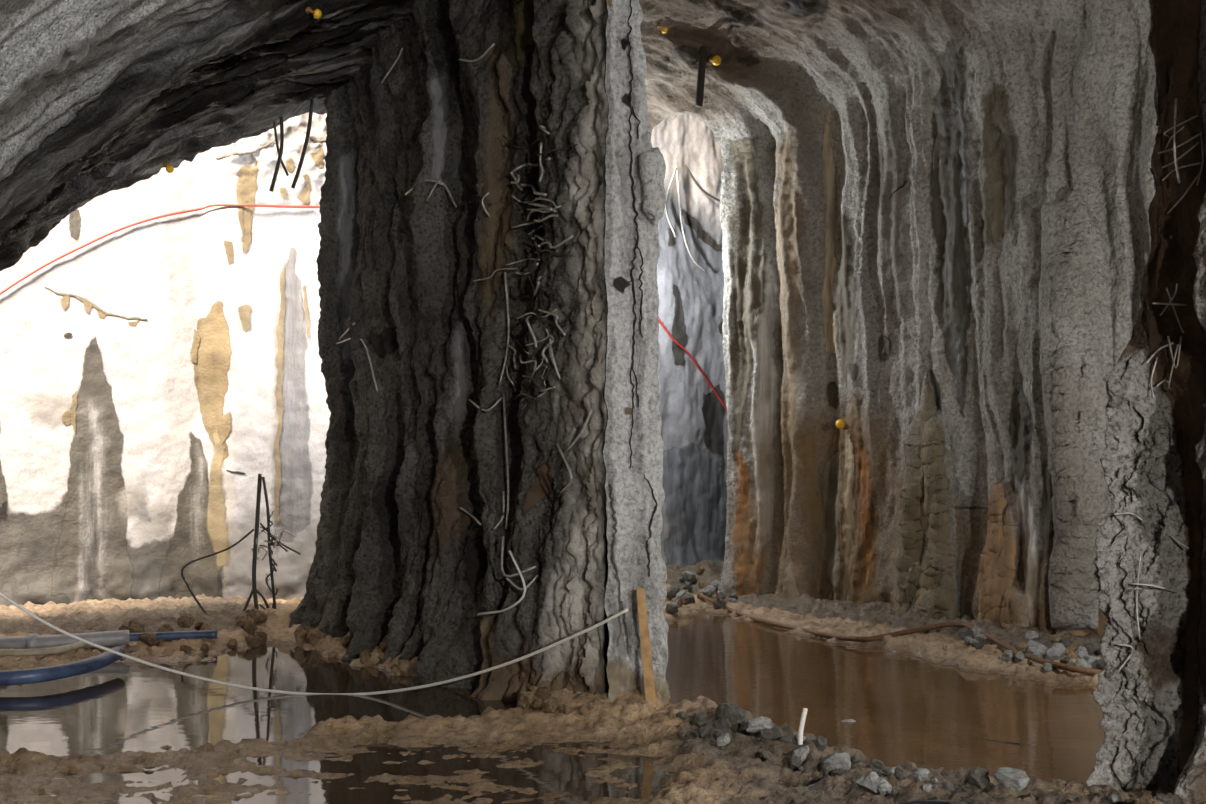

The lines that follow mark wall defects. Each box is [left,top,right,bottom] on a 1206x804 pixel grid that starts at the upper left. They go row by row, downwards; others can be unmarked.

damp [0,248,313,606]
crack [609,0,657,654]
rust [733,451,764,596]
rust [810,408,893,605]